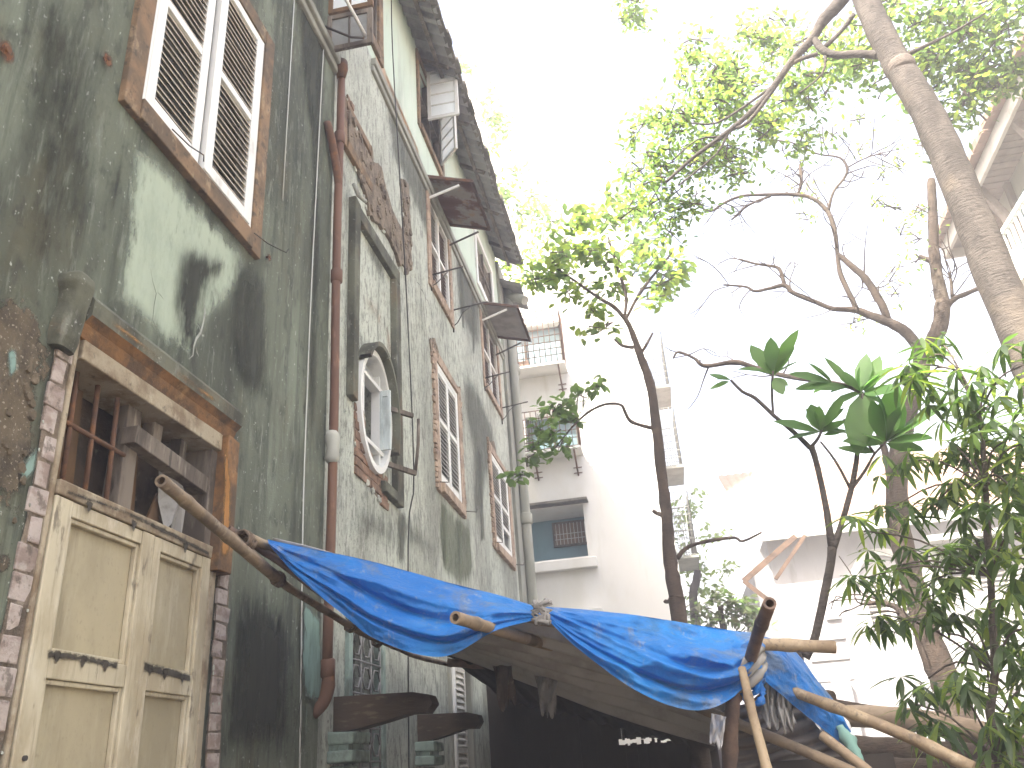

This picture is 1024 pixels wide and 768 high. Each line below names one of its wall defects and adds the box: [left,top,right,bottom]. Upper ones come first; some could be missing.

damp [178,252,222,342]
damp [236,270,266,390]
flaking render [0,298,73,755]
damp [230,602,287,741]